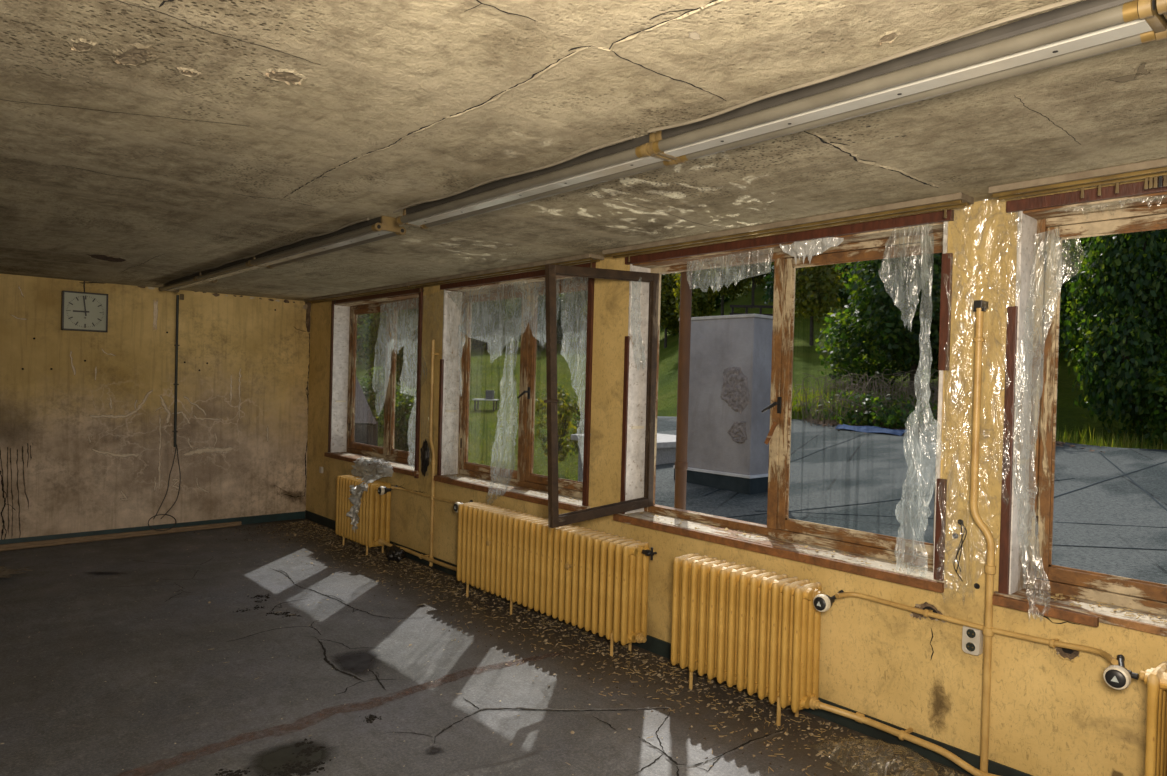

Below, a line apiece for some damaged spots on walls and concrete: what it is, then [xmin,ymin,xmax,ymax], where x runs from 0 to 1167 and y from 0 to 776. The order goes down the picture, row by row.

crack [117,0,321,65]
crack [233,0,726,207]
crack [804,129,941,188]
water stain [0,443,32,538]
crack [226,569,403,695]
water stain [253,742,330,776]
crack [400,699,787,776]
water stain [933,687,945,723]